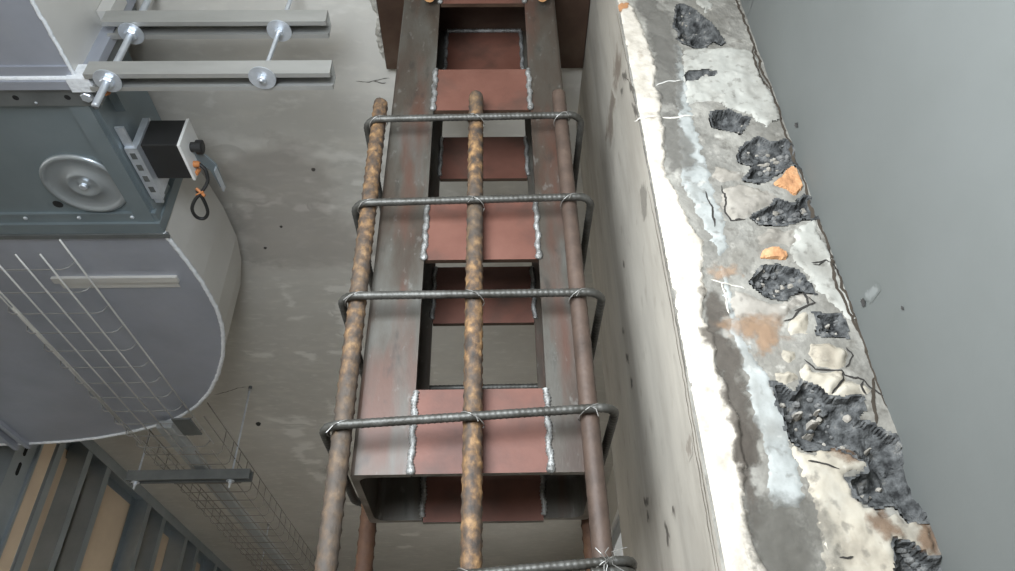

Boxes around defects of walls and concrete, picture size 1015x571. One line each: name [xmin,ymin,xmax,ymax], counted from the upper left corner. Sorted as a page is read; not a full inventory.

spalling [370,0,385,60]
flaking render [618,0,942,571]
crack [705,0,888,423]